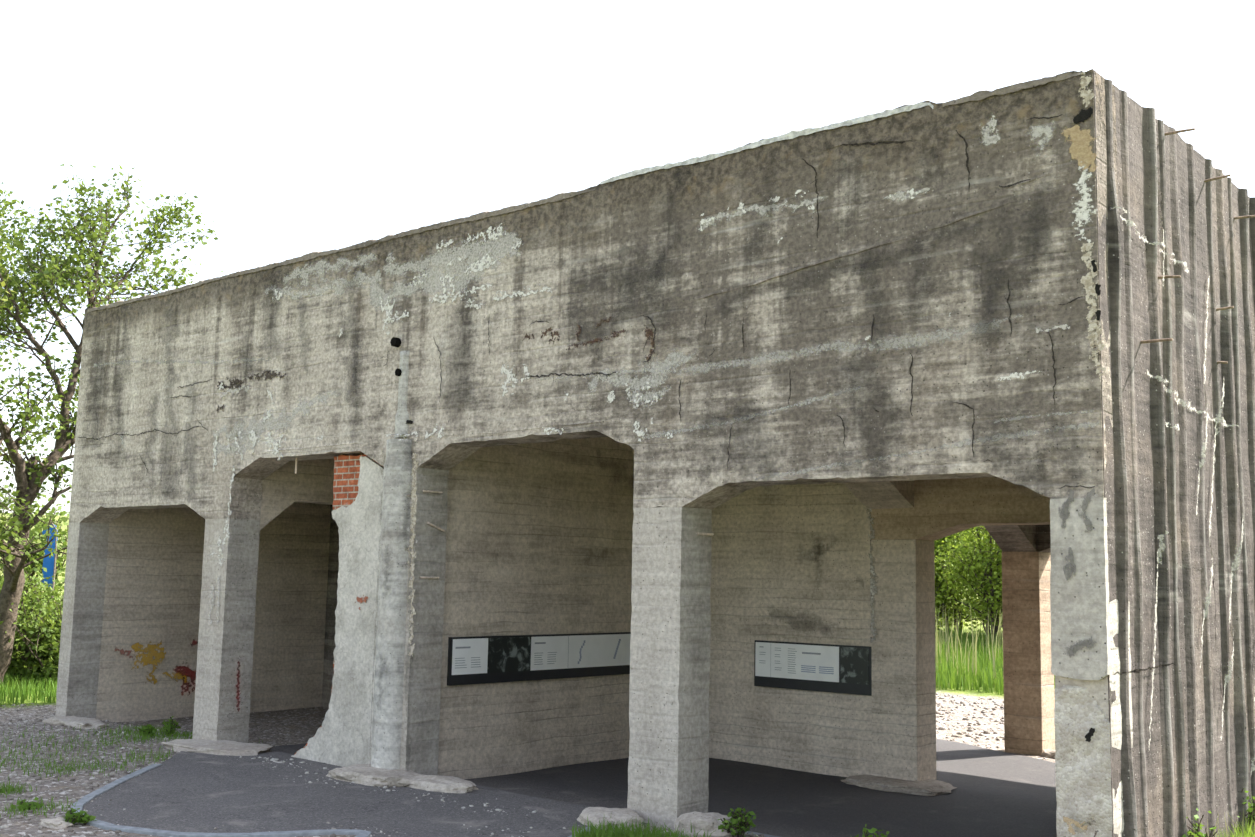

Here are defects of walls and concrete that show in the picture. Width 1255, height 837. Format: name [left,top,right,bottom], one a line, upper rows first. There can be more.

spalling [87,188,595,312]
water stain [265,223,552,335]
crack [803,159,819,238]
crack [840,139,910,147]
crack [956,130,970,188]
spalling [943,71,1106,379]
spalling [1054,685,1113,837]